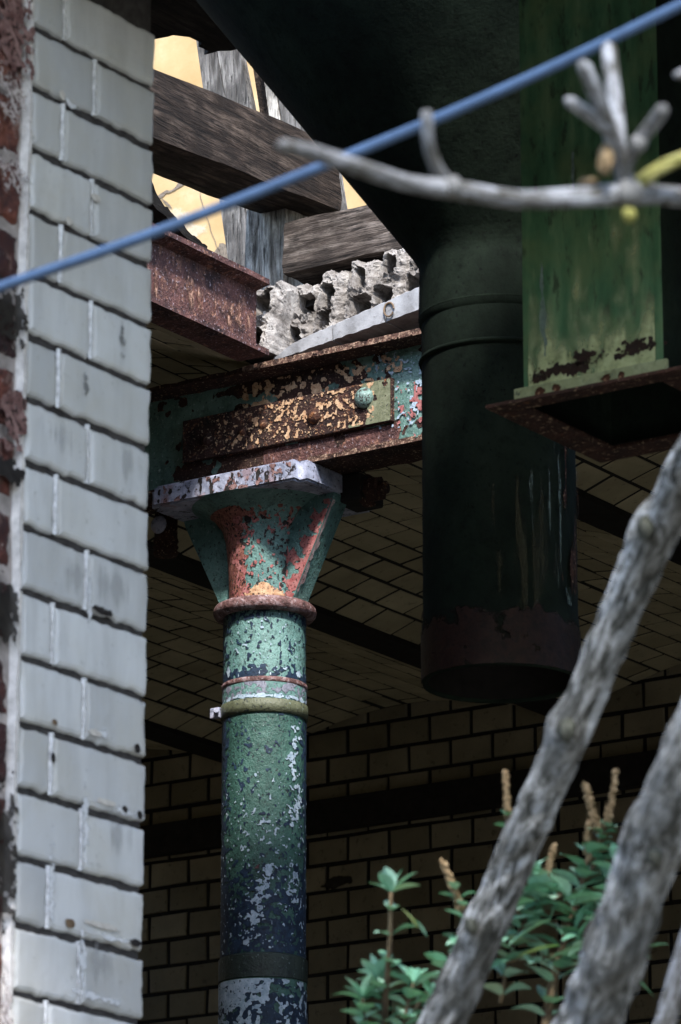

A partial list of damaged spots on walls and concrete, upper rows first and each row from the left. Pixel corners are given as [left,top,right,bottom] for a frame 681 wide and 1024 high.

corrosion [189,286,250,326]
corrosion [213,353,391,410]
peeling [200,461,291,496]
corrosion [157,419,422,503]
peeling [210,498,335,599]
peeling [222,609,307,704]
corrosion [421,603,581,685]
peeling [220,713,307,959]
peeling [218,978,307,1024]